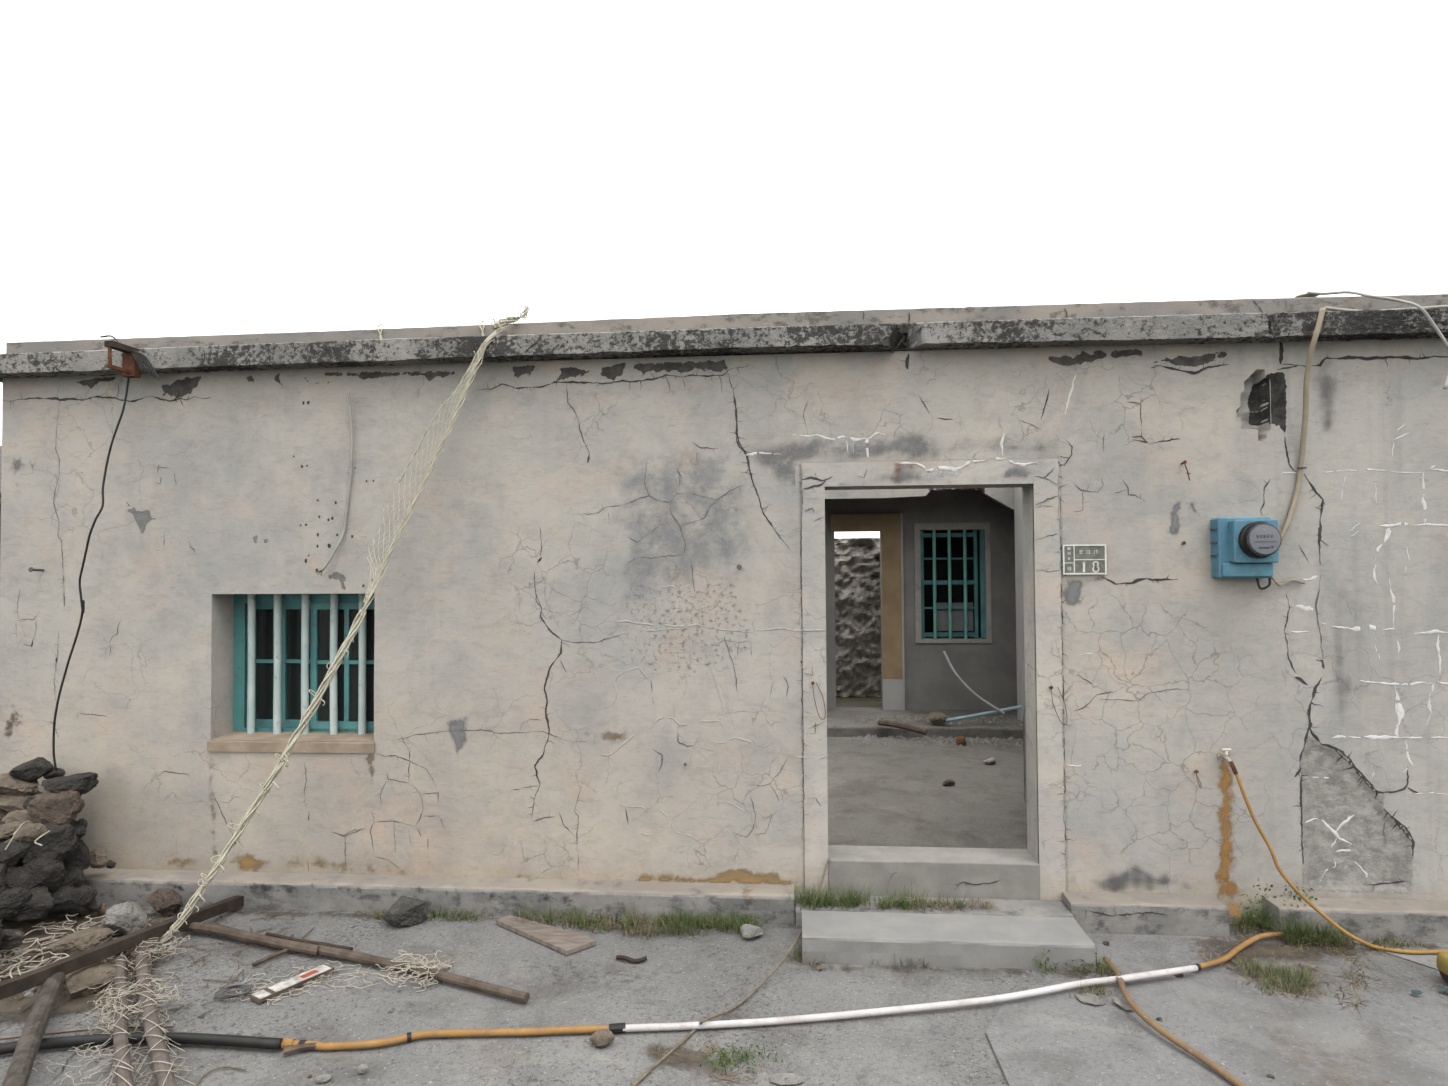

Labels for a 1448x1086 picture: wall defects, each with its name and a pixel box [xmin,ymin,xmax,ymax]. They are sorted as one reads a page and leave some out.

peeling [162,376,201,397]
peeling [557,360,728,381]
peeling [1049,349,1229,375]
crack [1254,300,1448,370]
crack [303,530,622,869]
crack [483,366,867,840]
crack [1020,390,1185,860]
crack [1260,436,1327,779]
damp [1291,423,1448,660]
damp [1333,630,1448,773]
rust [1217,760,1240,916]
spalling [1292,736,1415,895]